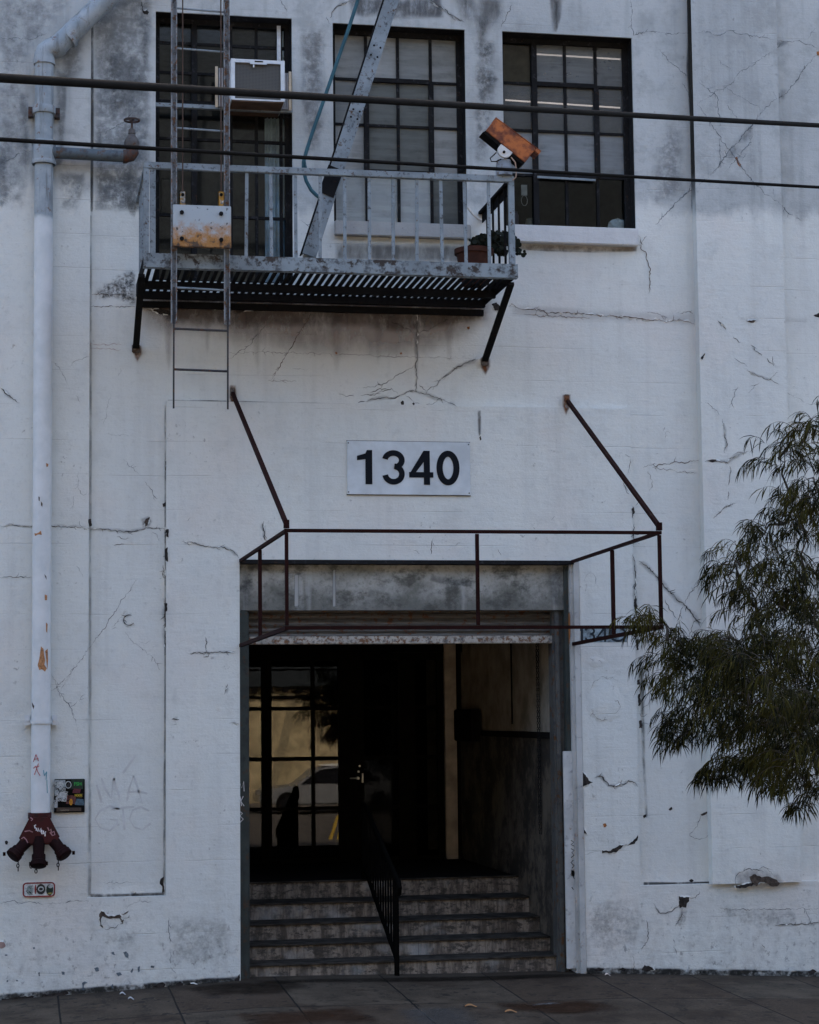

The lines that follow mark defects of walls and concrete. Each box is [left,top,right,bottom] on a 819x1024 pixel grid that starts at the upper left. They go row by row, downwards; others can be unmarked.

crack [630,4,812,219]
crack [92,293,210,311]
crack [342,314,478,405]
crack [510,192,812,637]
crack [2,488,238,579]
crack [53,587,166,720]
crack [597,773,637,789]
spalling [98,910,129,930]
spalling [677,895,691,908]
spalling [734,874,780,888]